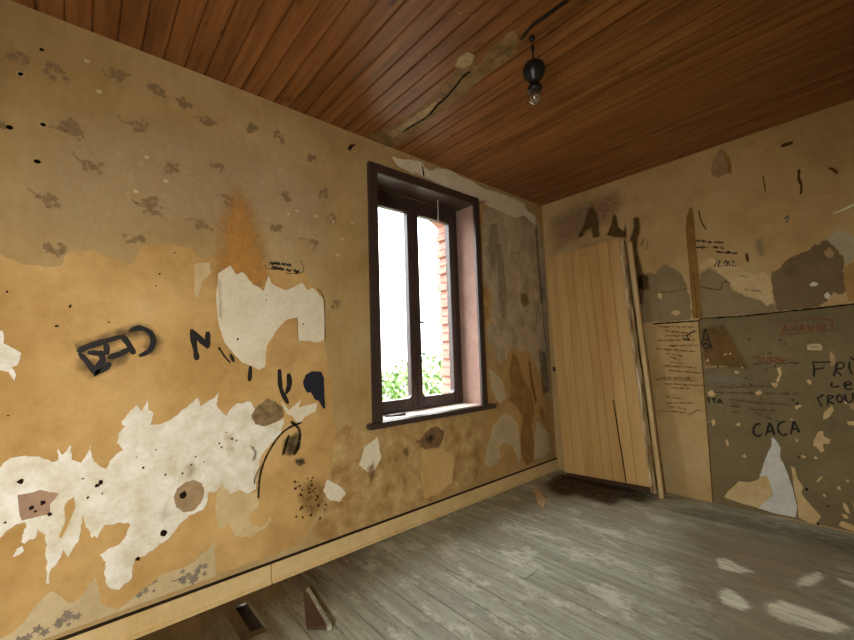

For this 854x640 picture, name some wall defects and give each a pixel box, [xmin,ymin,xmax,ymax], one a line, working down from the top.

peeling [368,31,536,225]
peeling [0,198,483,639]
water stain [481,197,551,481]
peeling [635,230,854,532]